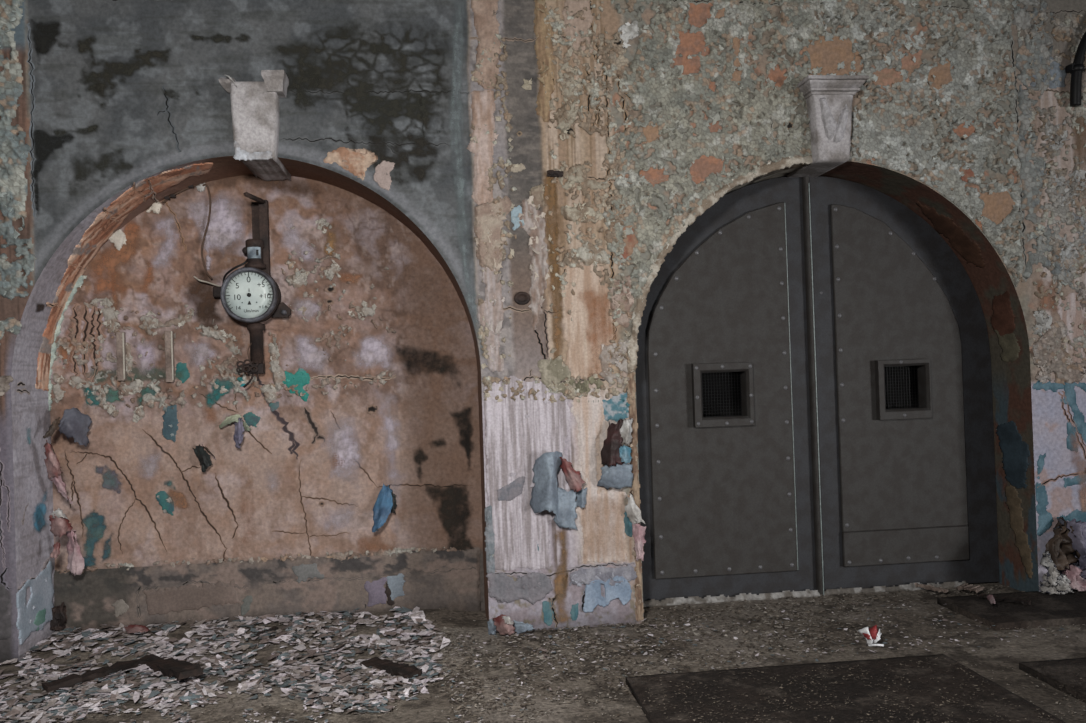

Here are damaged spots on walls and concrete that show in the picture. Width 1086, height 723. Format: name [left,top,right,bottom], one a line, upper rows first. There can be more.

peeling [0,0,37,300]
spalling [233,141,272,161]
spalling [323,147,395,191]
damp [277,7,478,328]
crack [469,0,692,210]
crack [65,449,167,554]
spalling [0,163,397,645]
peeling [364,573,405,607]
crack [135,379,638,628]
crack [478,252,633,404]
peeling [467,0,1086,635]
crack [1037,391,1086,488]